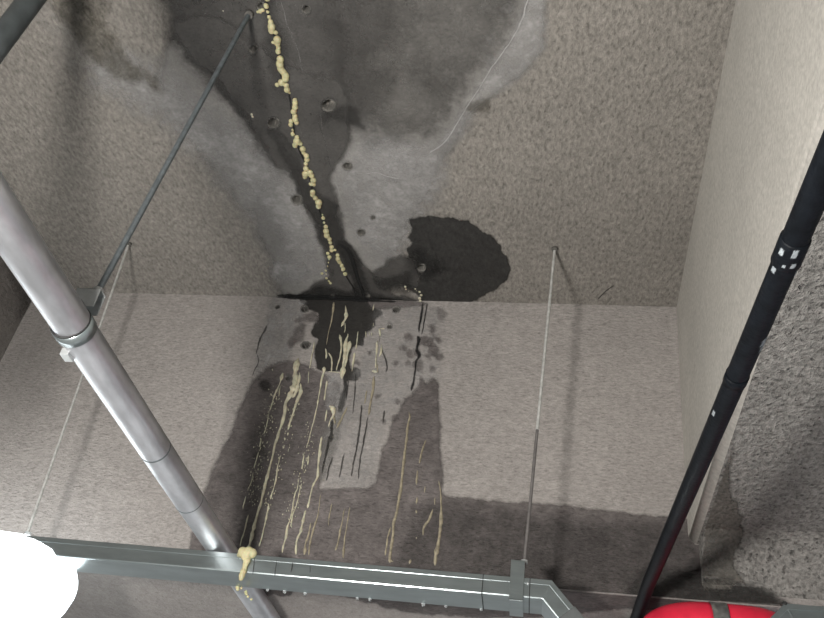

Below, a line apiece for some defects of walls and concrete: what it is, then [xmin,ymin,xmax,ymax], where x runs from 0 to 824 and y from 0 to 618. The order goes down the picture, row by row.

crack [265,1,313,190]
crack [277,209,416,302]
leakage [59,0,668,614]
leakage [345,596,542,618]
leakage [647,452,783,610]